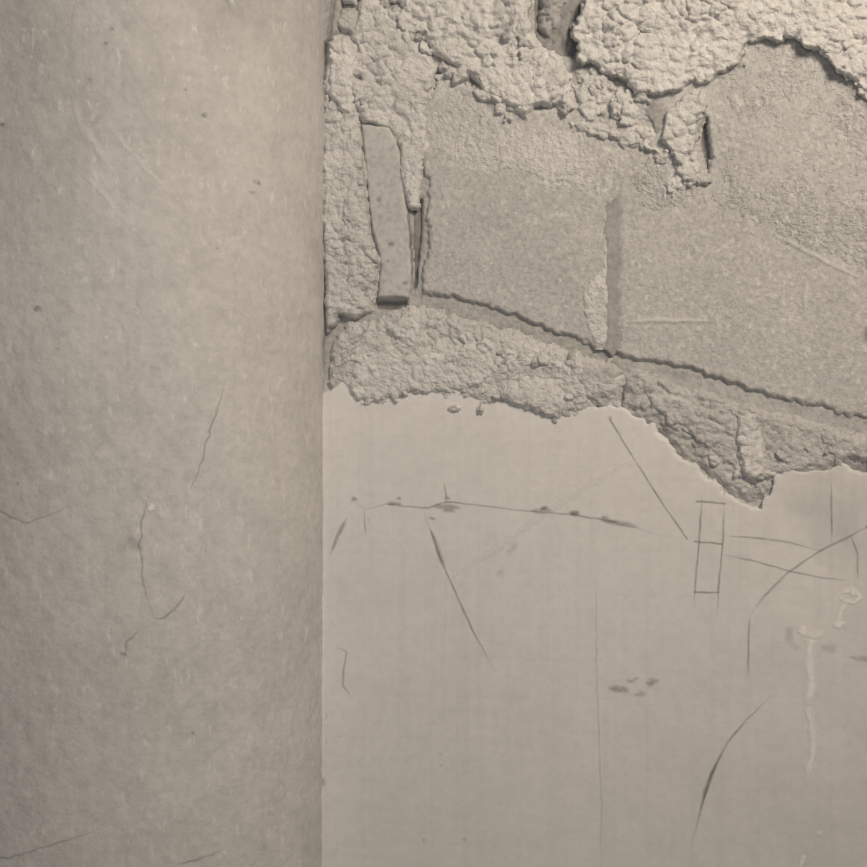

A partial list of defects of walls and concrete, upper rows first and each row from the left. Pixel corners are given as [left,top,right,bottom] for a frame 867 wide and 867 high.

spalling [323,0,867,508]